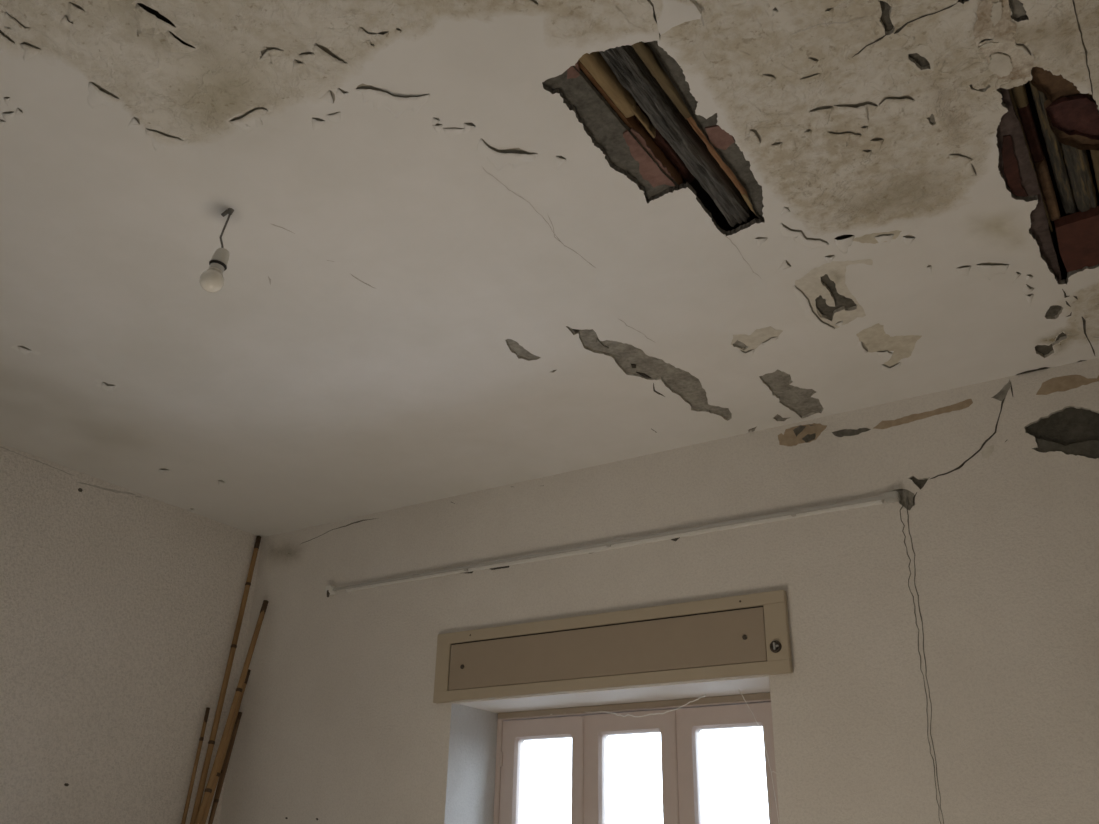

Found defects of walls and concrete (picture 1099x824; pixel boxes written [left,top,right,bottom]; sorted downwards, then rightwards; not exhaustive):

flaking render [879,1,895,35]
peeling [957,0,1034,110]
spalling [542,62,767,248]
peeling [804,95,915,163]
flaking render [505,339,541,361]
flaking render [566,326,732,421]
flaking render [780,207,922,373]
flaking render [759,369,973,446]
flaking render [1024,406,1099,459]
peeling [1036,375,1099,395]
crack [1062,289,1099,362]
crack [900,367,1049,824]